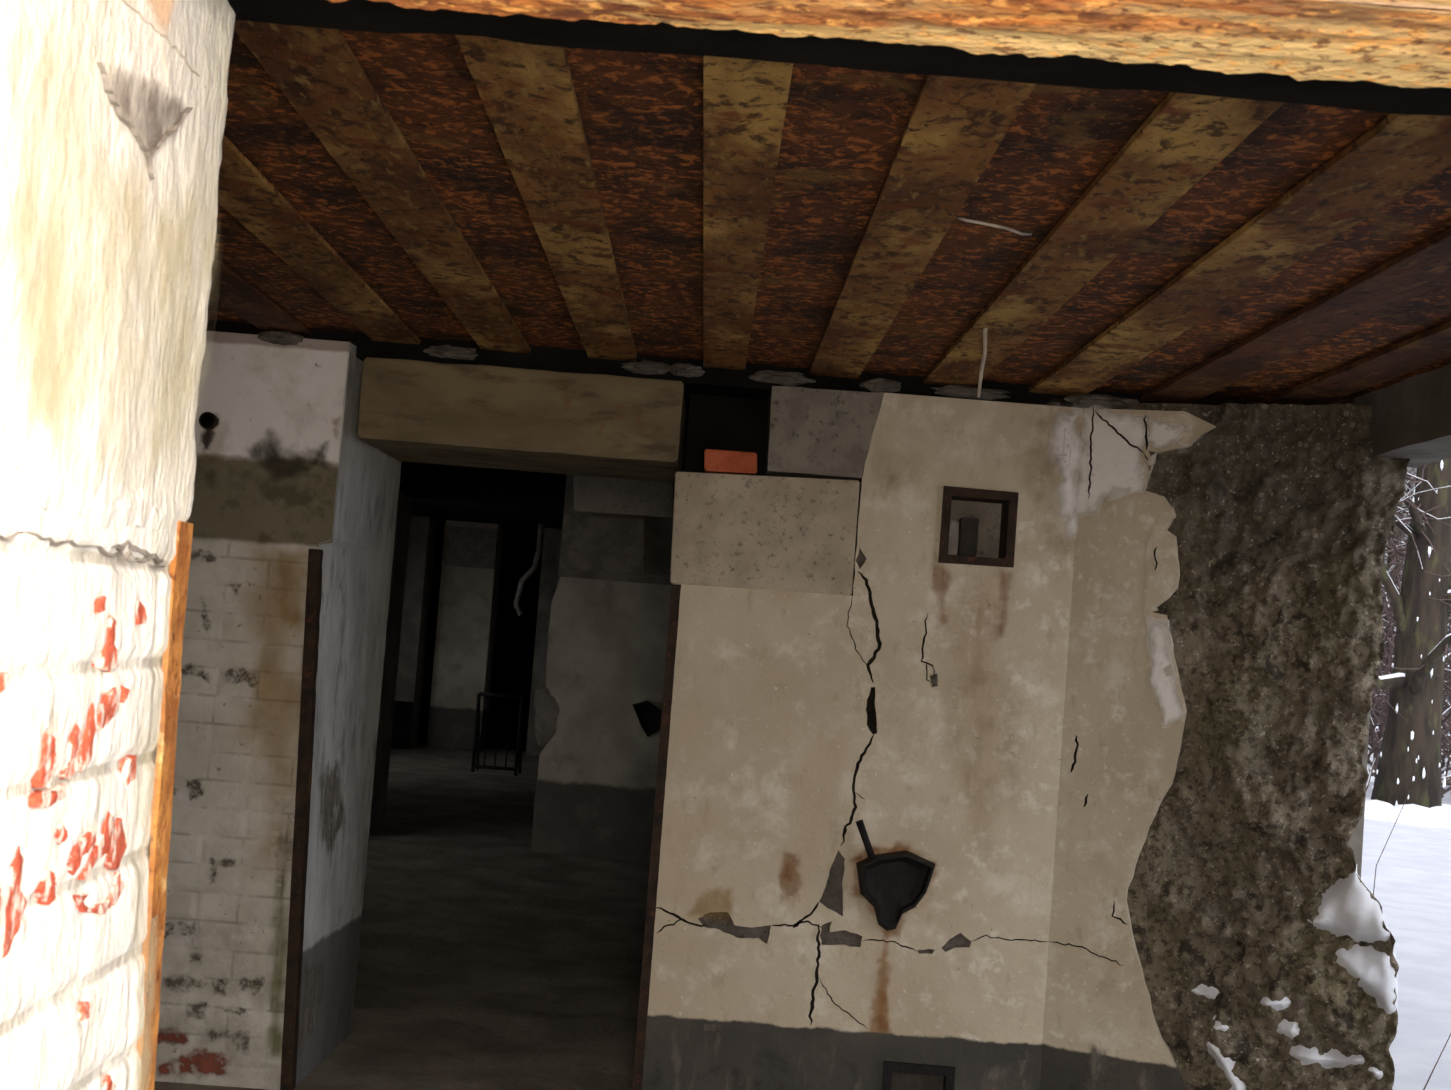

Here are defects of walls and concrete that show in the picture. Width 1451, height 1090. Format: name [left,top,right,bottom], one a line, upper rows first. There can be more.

leakage [252,441,324,477]
crack [0,531,167,568]
spalling [135,599,147,625]
crack [847,572,882,683]
spalling [0,595,130,961]
spalling [119,755,137,786]
crack [840,735,874,846]
crack [1070,735,1088,807]
crack [656,907,706,933]
crack [771,902,867,1029]
spalling [77,1001,91,1021]
spalling [102,1075,115,1090]